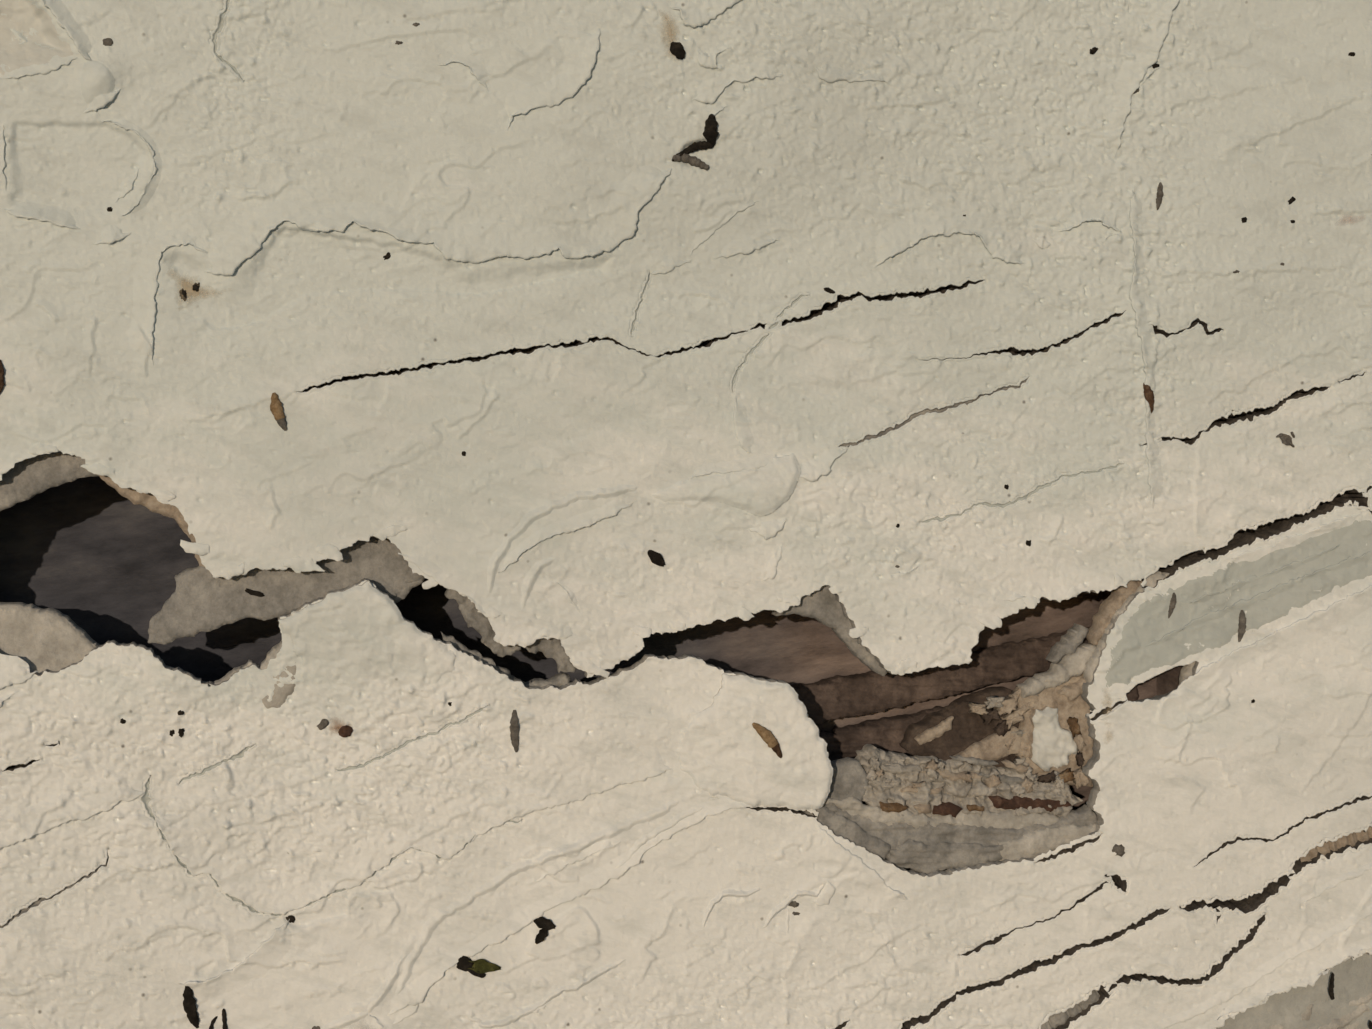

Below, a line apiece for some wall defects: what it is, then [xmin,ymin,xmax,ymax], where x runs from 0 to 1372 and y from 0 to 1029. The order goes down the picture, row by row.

crack [296,272,986,395]
crack [836,308,1224,449]
peeling [0,654,40,707]
peeling [0,442,209,567]
peeling [393,553,502,619]
peeling [772,584,917,676]
peeling [1028,706,1078,772]
crack [921,369,1367,525]
peeling [1099,520,1372,730]
crack [1141,484,1372,591]
crack [898,793,1372,1029]
flaking render [1195,934,1372,1029]